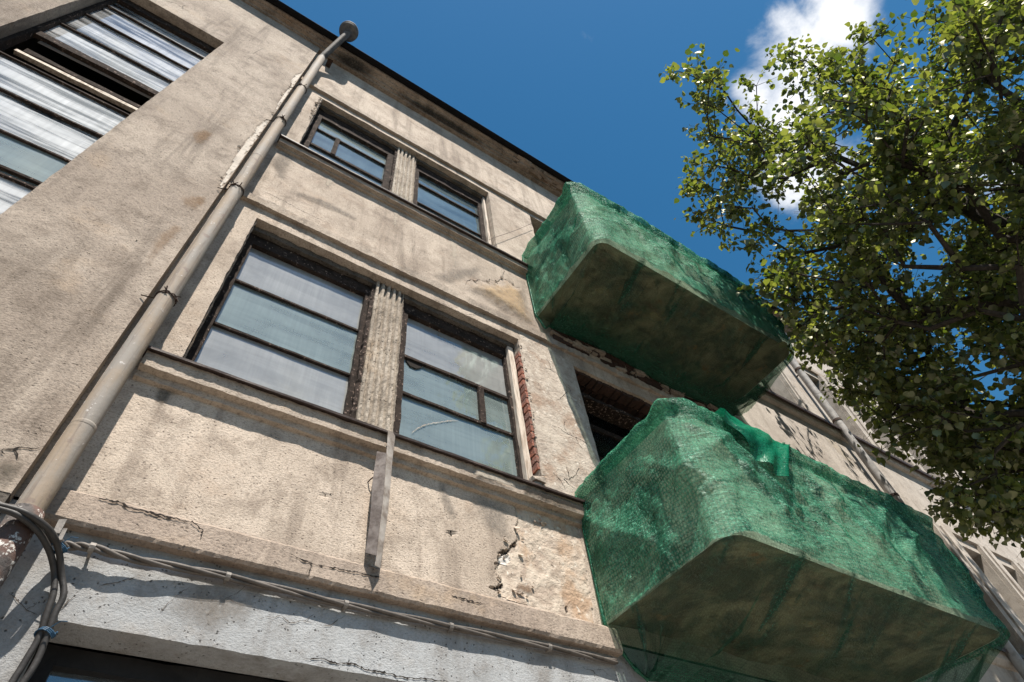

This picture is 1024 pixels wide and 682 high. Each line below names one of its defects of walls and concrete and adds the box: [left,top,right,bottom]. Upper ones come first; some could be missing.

peeling [220,72,302,188]
crack [99,498,204,537]
crack [291,554,386,579]
flaking render [493,506,594,623]
crack [306,658,446,681]